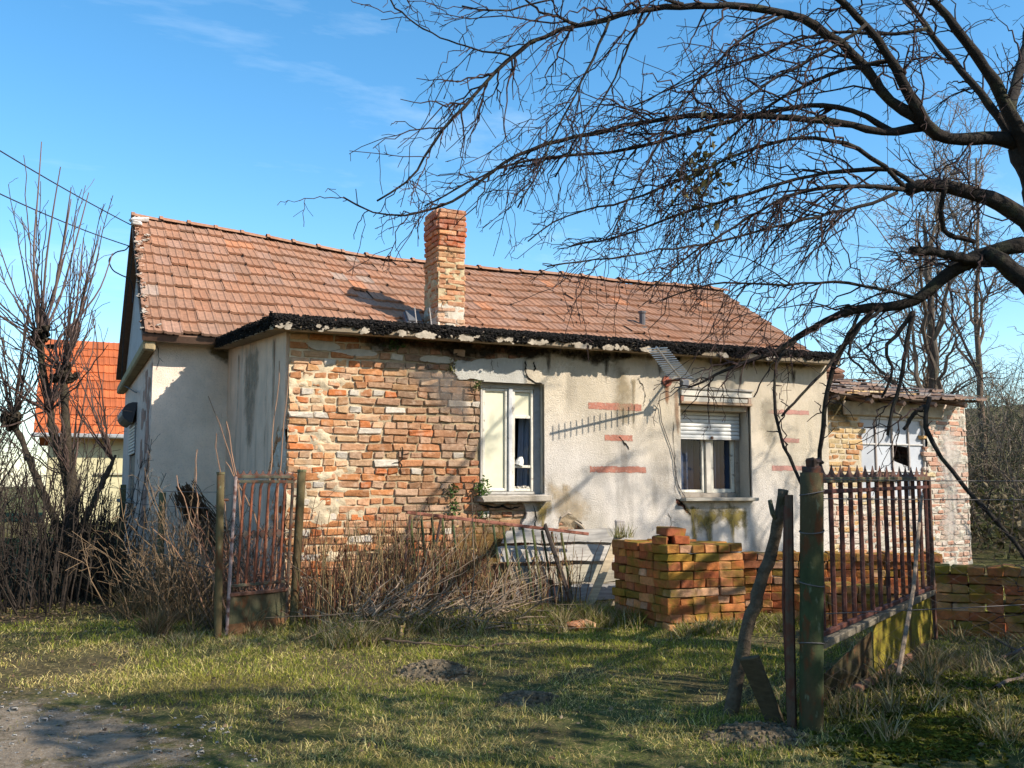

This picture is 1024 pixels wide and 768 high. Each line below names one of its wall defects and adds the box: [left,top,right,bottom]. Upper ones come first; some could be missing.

water stain [210,347,257,442]
peeling [571,342,652,353]
flaking render [269,322,549,619]
water stain [691,507,712,541]